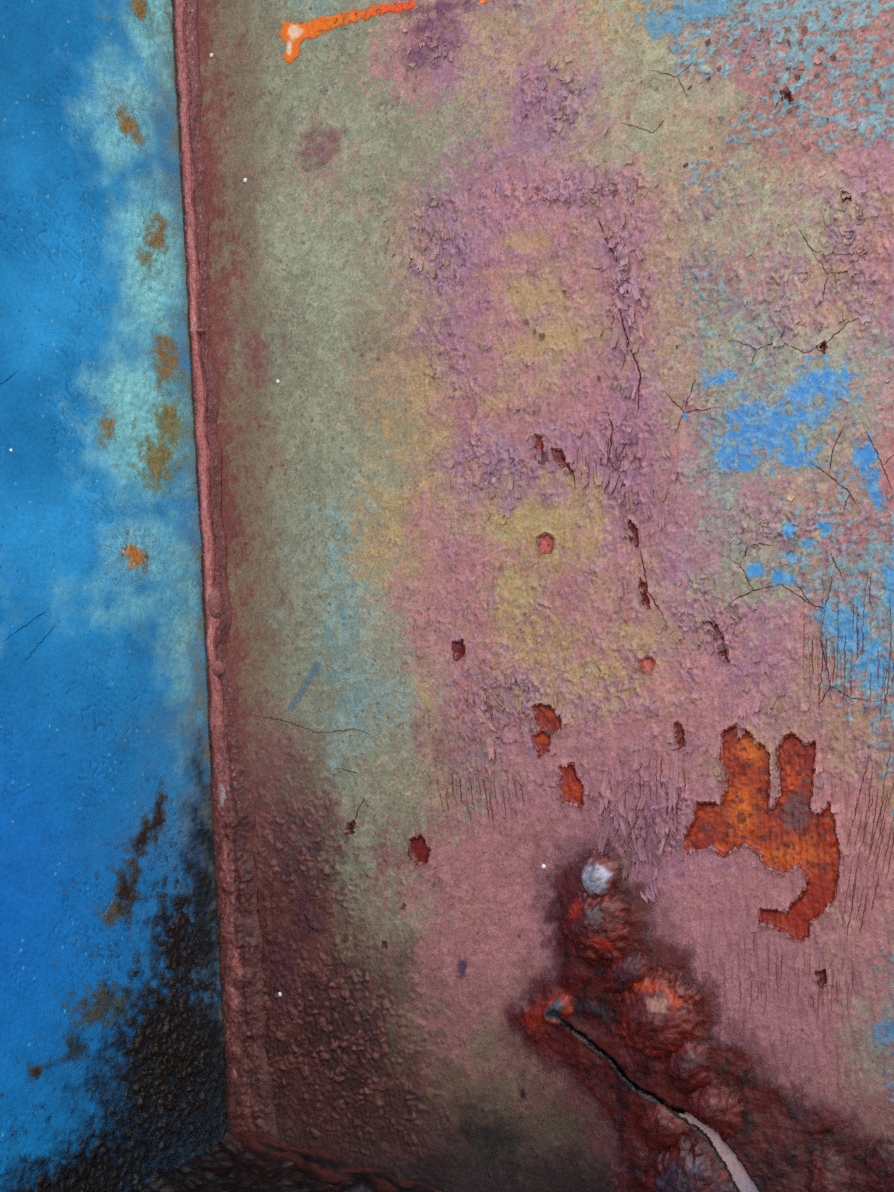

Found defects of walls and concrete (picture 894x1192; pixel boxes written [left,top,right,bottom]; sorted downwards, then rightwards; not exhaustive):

rust [102,83,147,154]
rust [117,314,188,492]
peeling [446,156,894,555]
rust [103,509,173,580]
peeling [452,638,466,661]
peeling [461,510,849,942]
peeling [809,545,894,710]
rust [95,783,168,926]
peeling [405,832,438,877]
rust [28,981,135,1080]
crack [559,1016,759,1192]
rust [506,839,894,1192]